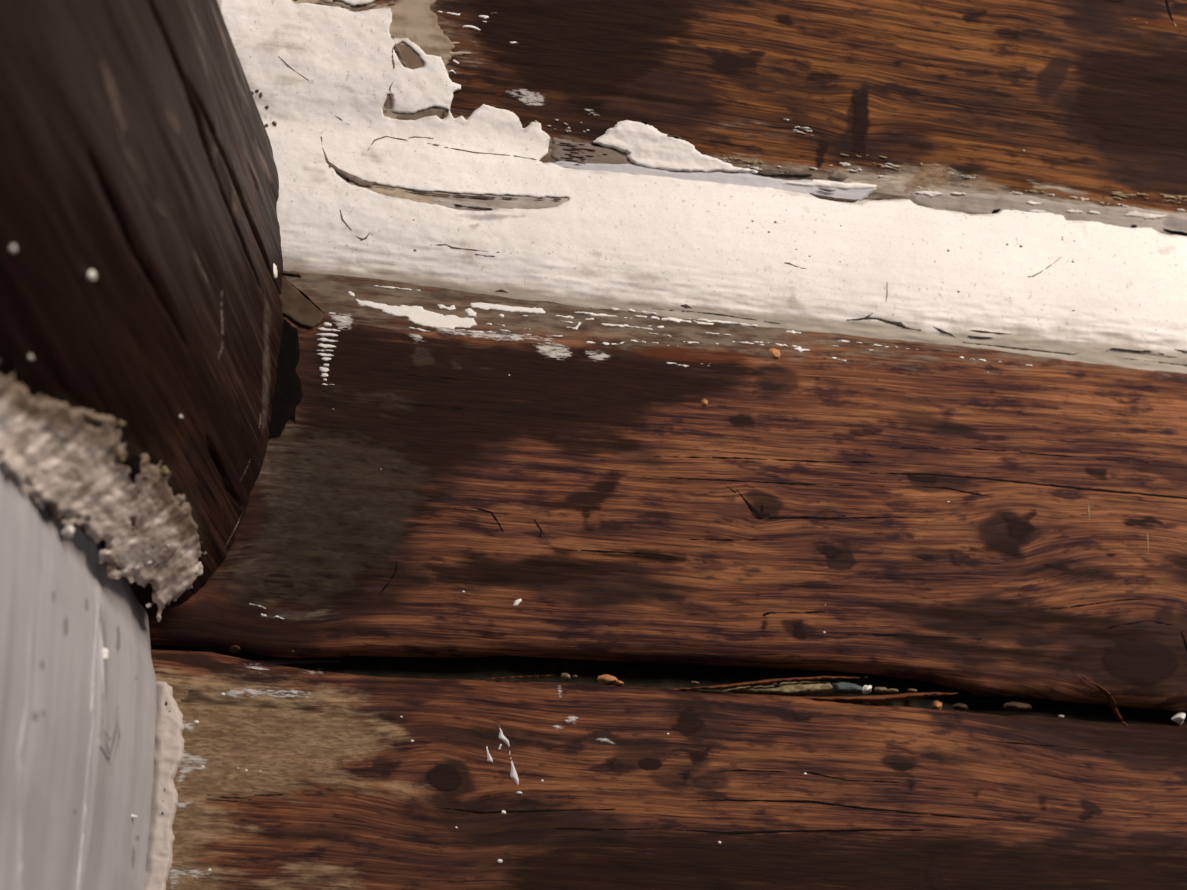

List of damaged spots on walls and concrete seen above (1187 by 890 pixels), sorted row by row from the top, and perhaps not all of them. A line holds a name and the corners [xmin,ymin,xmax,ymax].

peeling [291,0,496,76]
water stain [472,0,702,111]
peeling [506,89,544,106]
peeling [321,136,569,211]
peeling [535,109,901,202]
water stain [840,164,1010,198]
peeling [911,163,1187,235]
peeling [348,291,809,352]
water stain [262,302,271,429]
water stain [266,313,756,603]
crack [189,647,342,664]
water stain [509,826,1187,890]